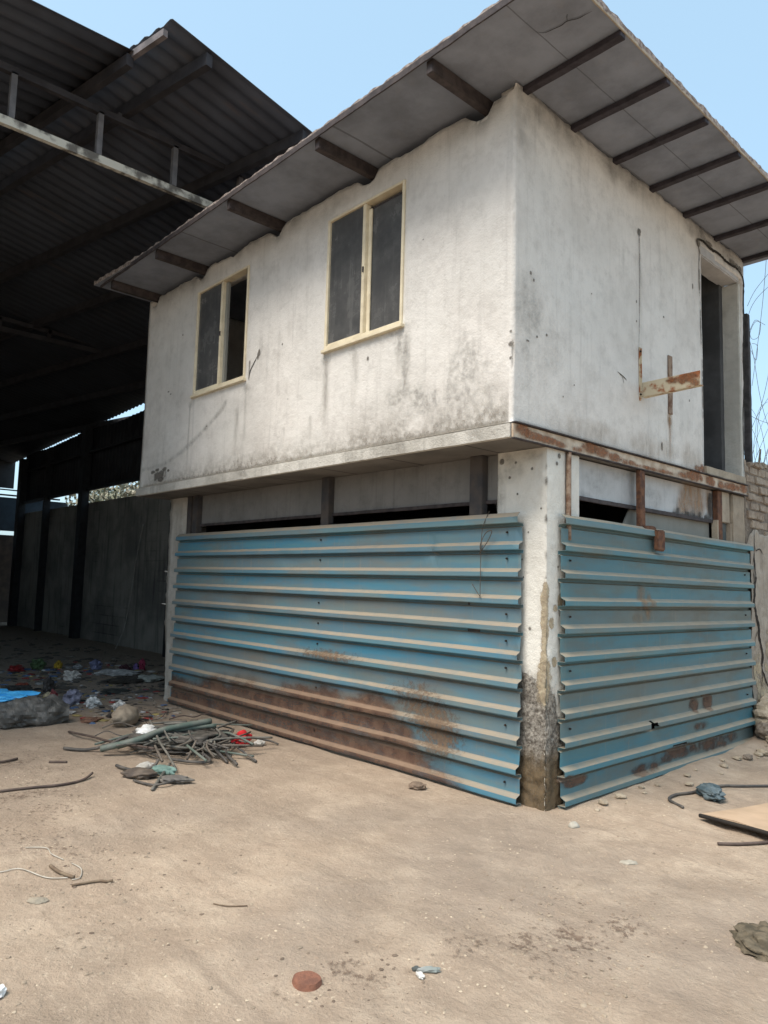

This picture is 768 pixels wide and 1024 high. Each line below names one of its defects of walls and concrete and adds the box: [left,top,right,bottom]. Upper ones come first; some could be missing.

corrosion [666,373,699,386]
corrosion [517,424,747,519]
corrosion [305,649,358,662]
corrosion [168,674,463,788]
corrosion [633,694,735,777]
corrosion [557,774,587,788]